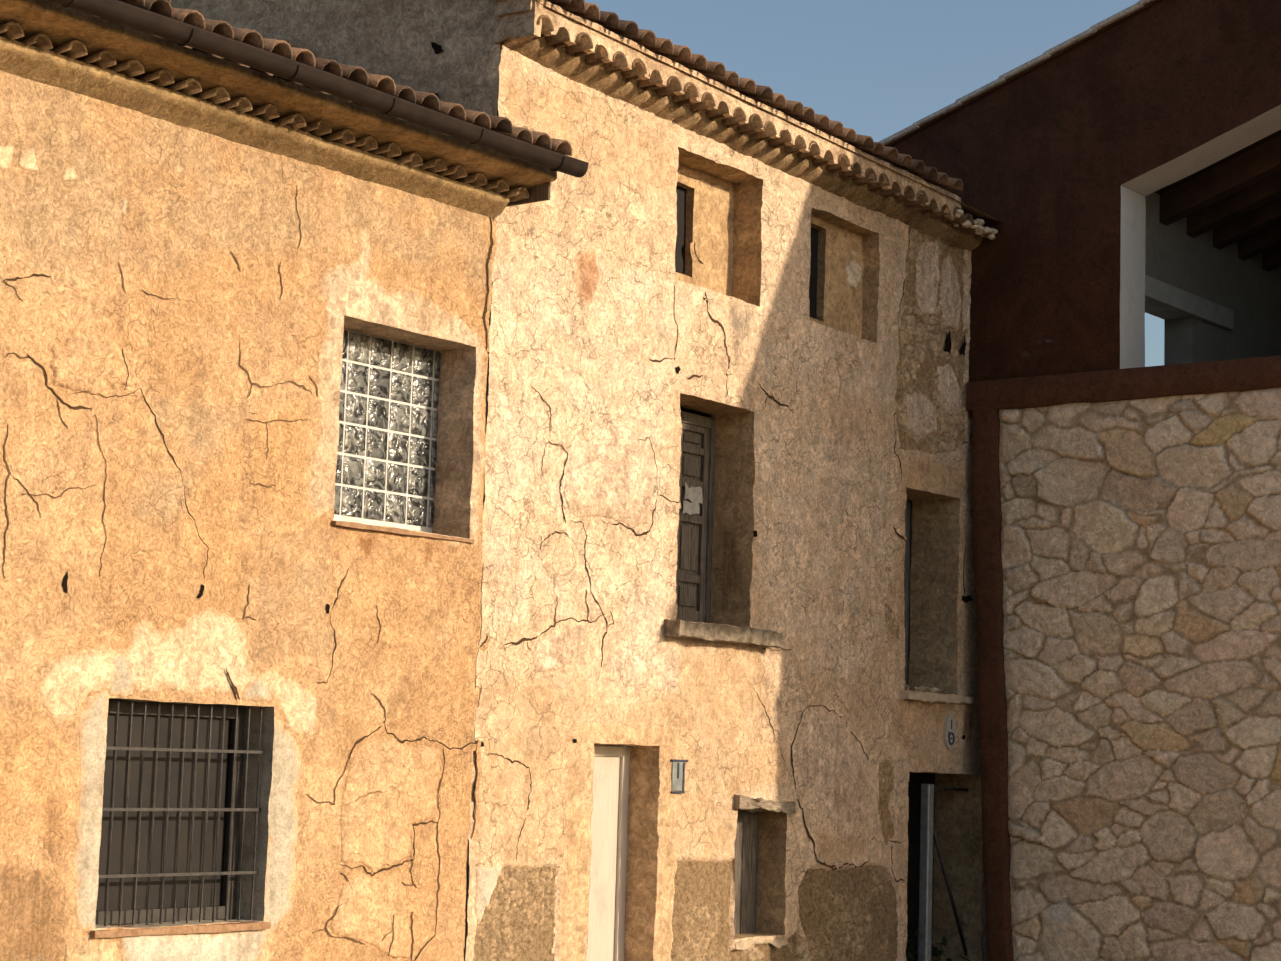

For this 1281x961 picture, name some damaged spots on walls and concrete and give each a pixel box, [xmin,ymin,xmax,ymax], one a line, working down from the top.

crack [3,348,209,579]
crack [239,343,318,488]
crack [279,187,302,299]
crack [483,217,497,353]
crack [471,387,681,707]
crack [649,242,794,418]
spalling [895,228,970,455]
spalling [949,209,998,240]
crack [306,687,532,961]
spalling [473,866,558,961]
spalling [670,860,898,961]
crack [753,691,906,887]